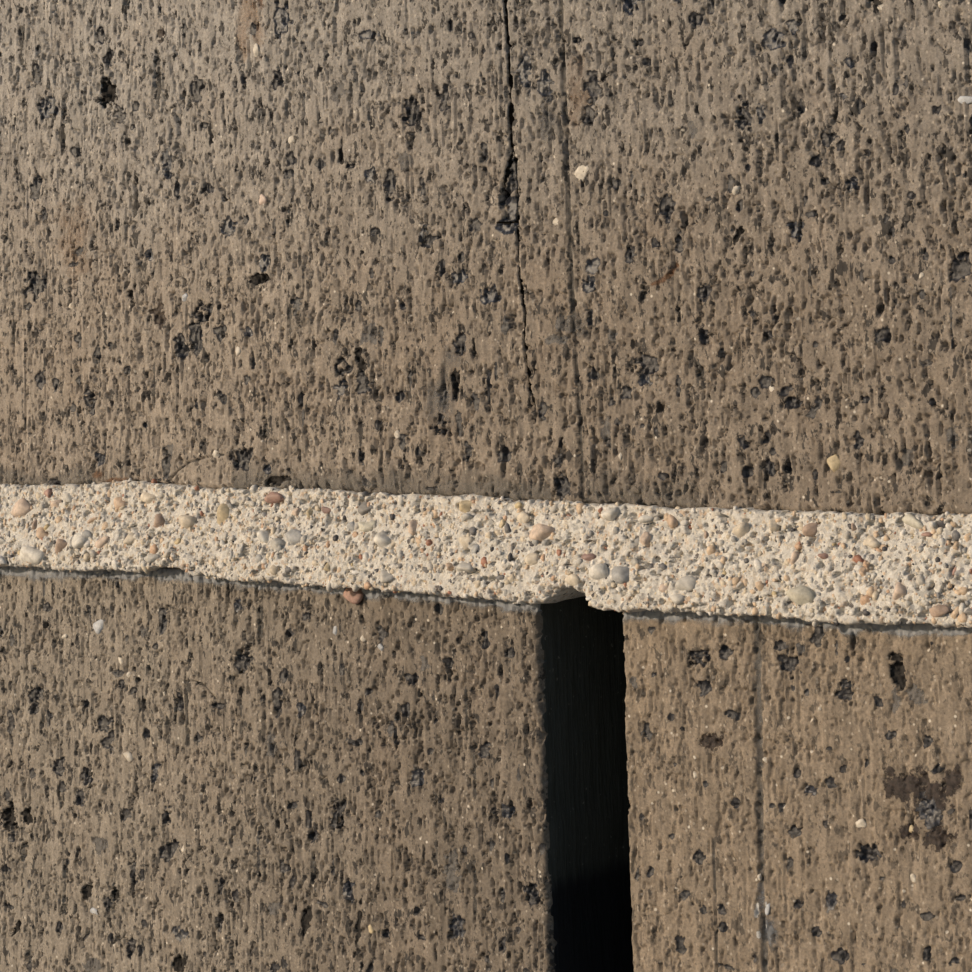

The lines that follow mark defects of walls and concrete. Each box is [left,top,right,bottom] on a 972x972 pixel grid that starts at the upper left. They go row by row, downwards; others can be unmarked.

crack [496,0,535,403]